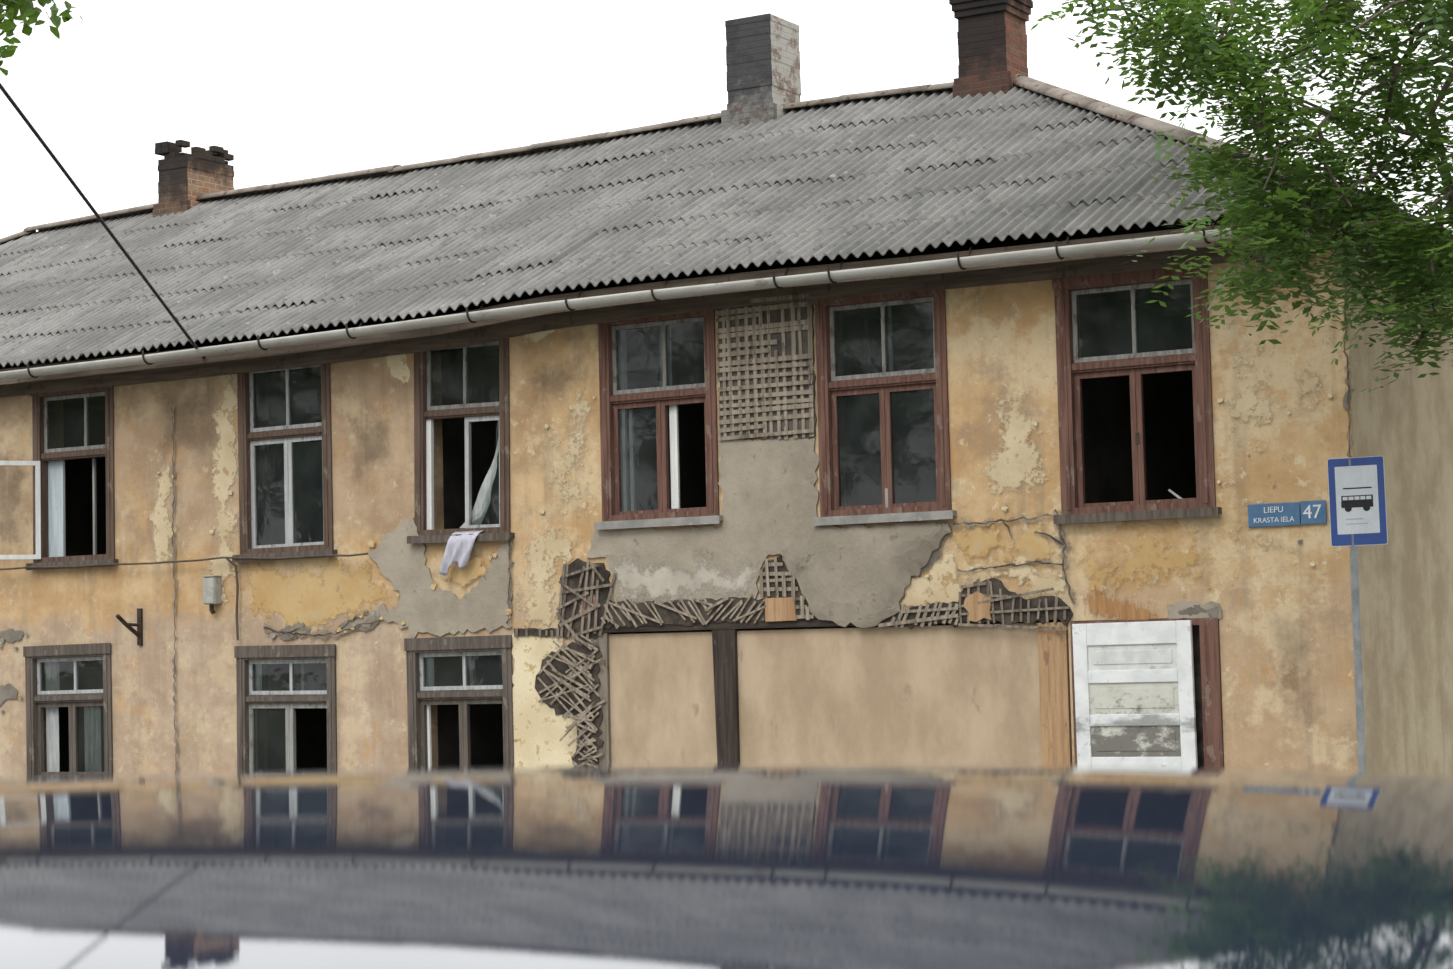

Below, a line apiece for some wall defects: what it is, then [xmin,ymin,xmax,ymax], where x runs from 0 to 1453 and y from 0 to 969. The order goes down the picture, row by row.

spalling [207,293,820,767]